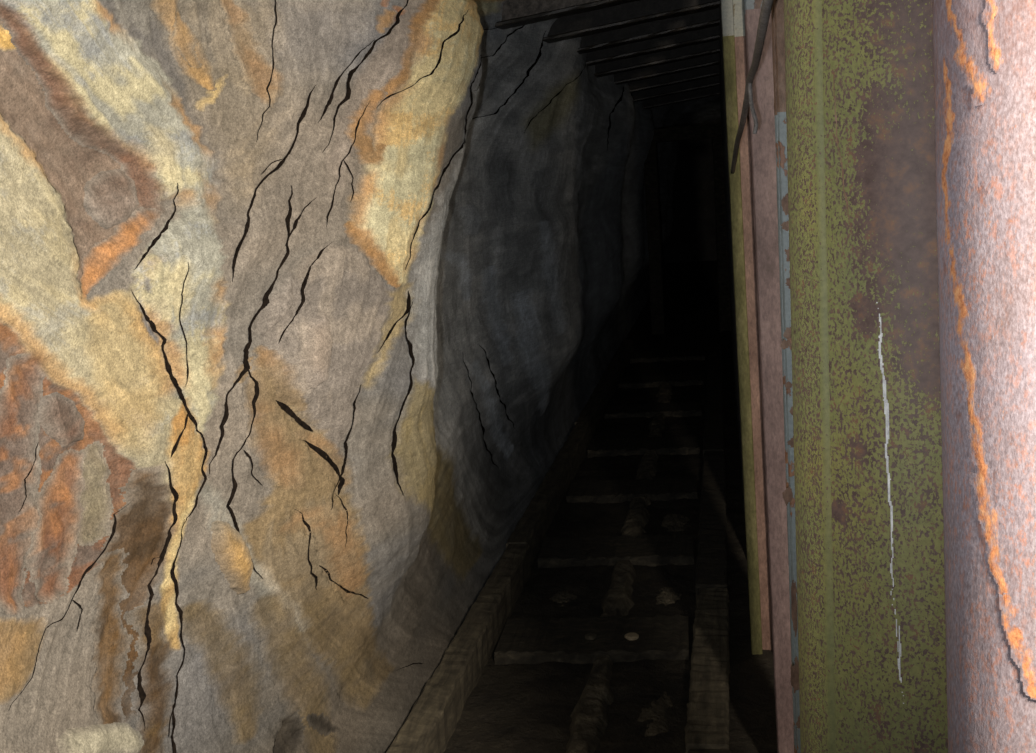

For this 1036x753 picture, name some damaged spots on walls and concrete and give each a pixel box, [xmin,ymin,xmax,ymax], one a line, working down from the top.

crack [131,0,546,753]
crack [524,59,587,133]
rust [940,0,1036,700]